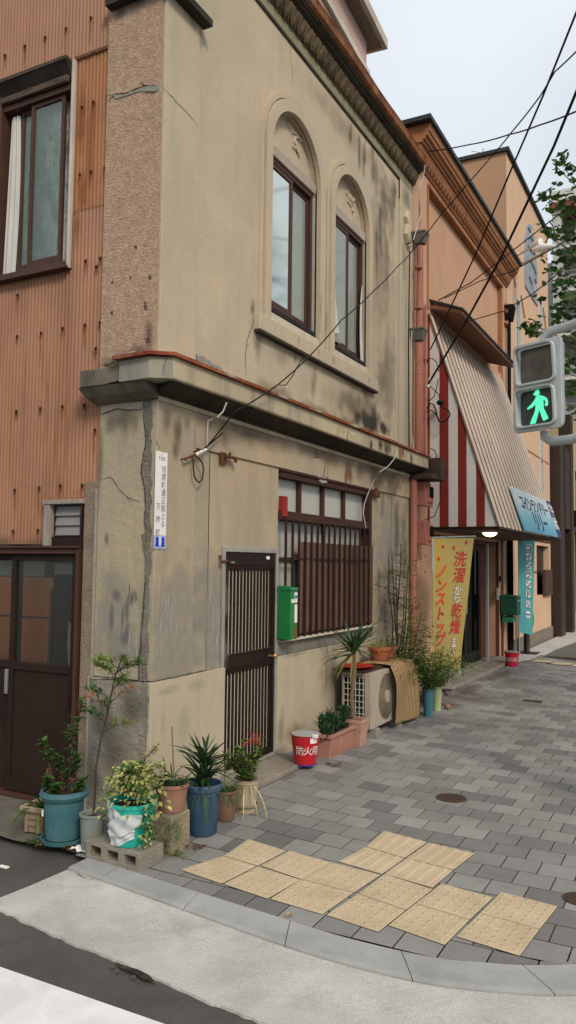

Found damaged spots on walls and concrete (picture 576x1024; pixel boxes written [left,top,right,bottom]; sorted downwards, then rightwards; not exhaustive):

crack [108,83,197,124]
water stain [356,409,388,452]
crack [94,400,222,731]